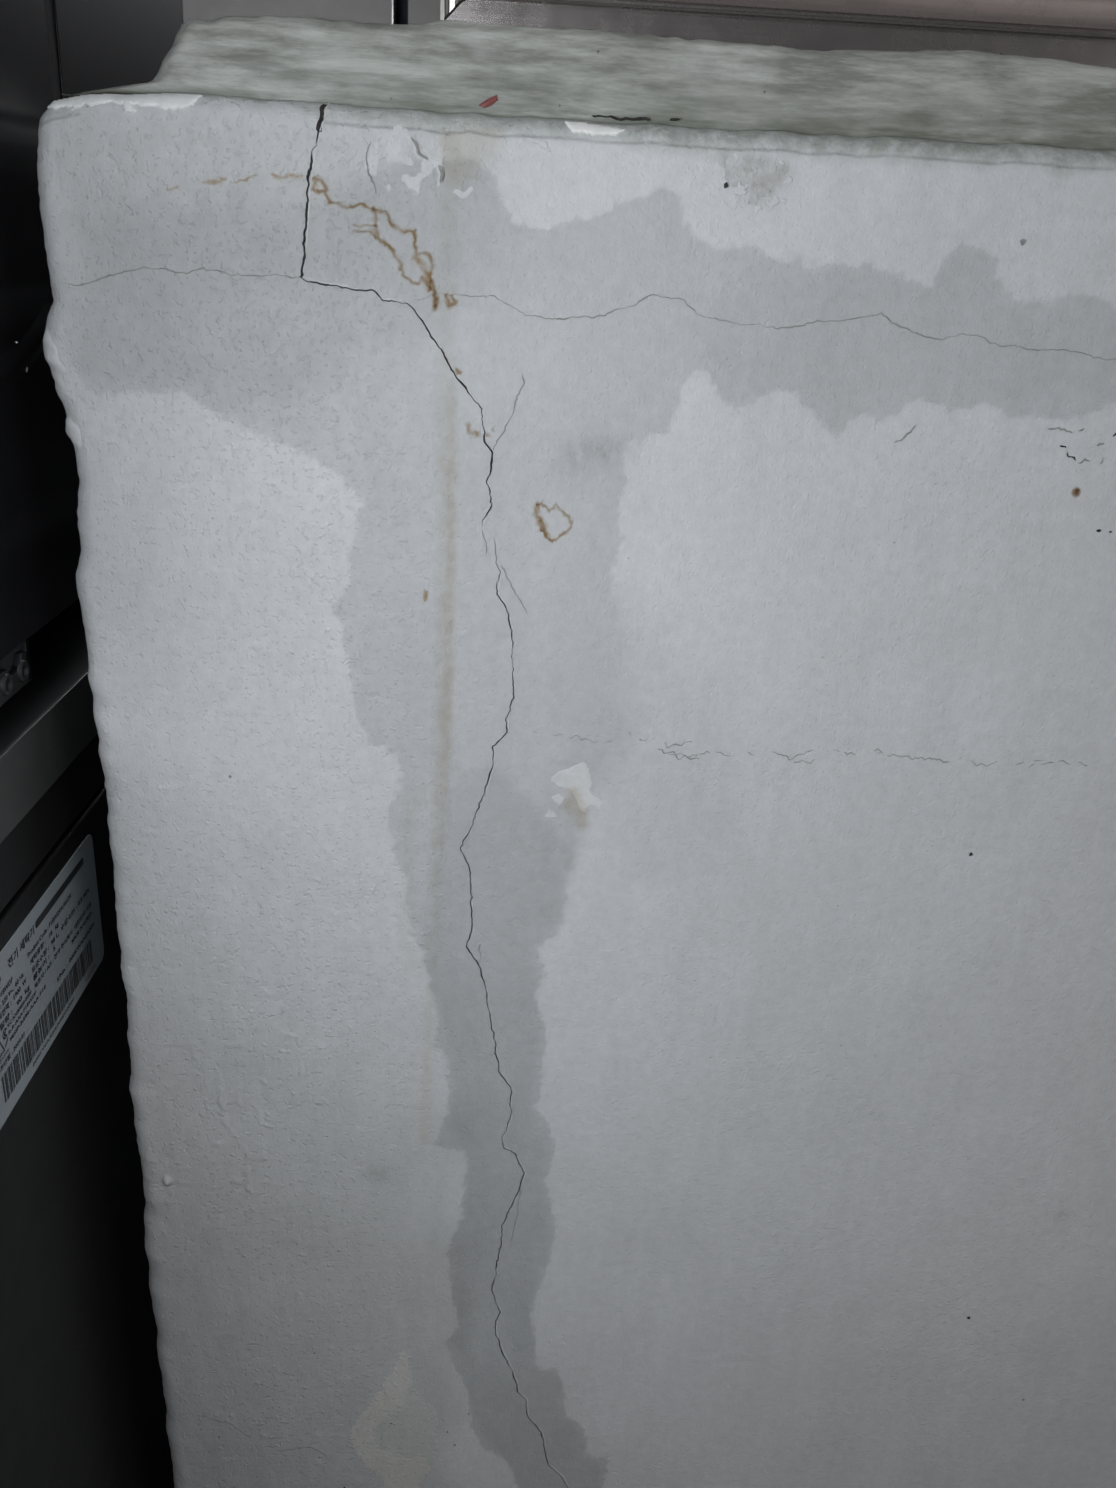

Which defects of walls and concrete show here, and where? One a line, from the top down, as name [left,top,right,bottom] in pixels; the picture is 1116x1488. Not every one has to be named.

crack [770,313,1112,360]
crack [1048,427,1116,464]
crack [533,731,1087,768]
crack [64,102,764,1488]
peeling [544,762,604,818]